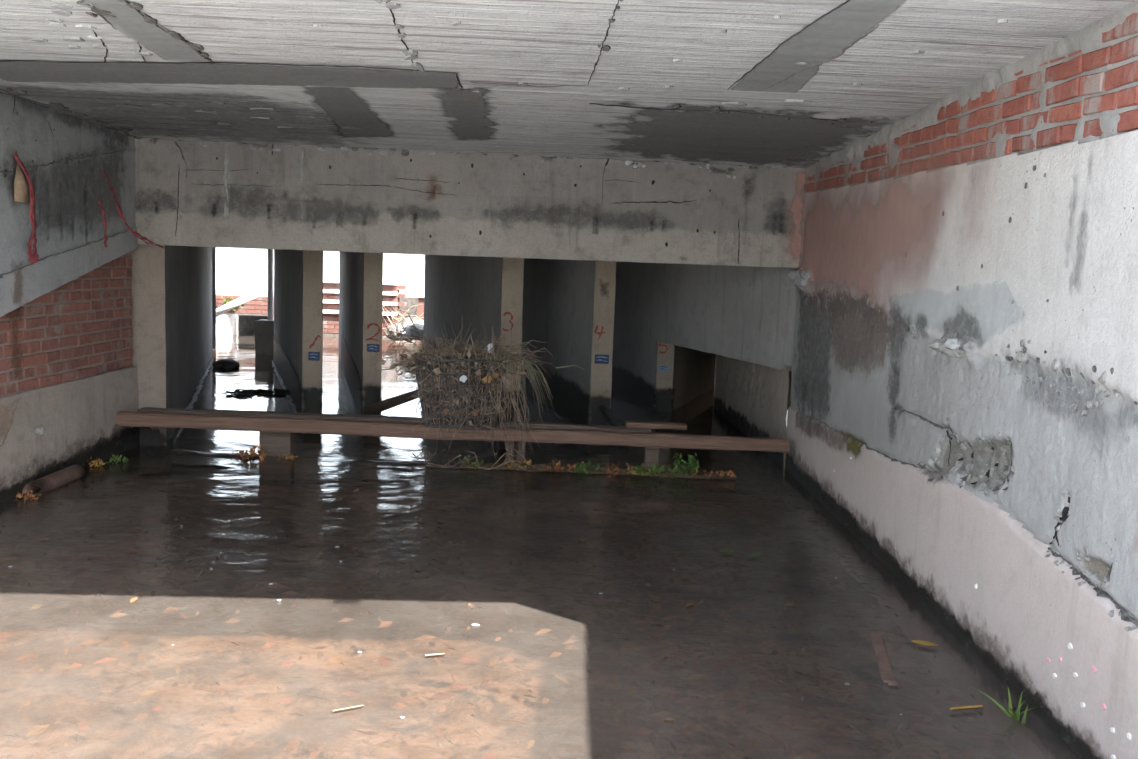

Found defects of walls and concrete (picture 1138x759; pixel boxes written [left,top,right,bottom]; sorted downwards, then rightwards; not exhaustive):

crack [375,0,424,72]
crack [471,0,623,87]
damp [0,60,497,140]
damp [589,103,888,166]
damp [795,291,834,436]
damp [888,308,927,437]
damp [942,311,981,348]
spalling [789,290,1138,620]
crack [1045,492,1138,631]